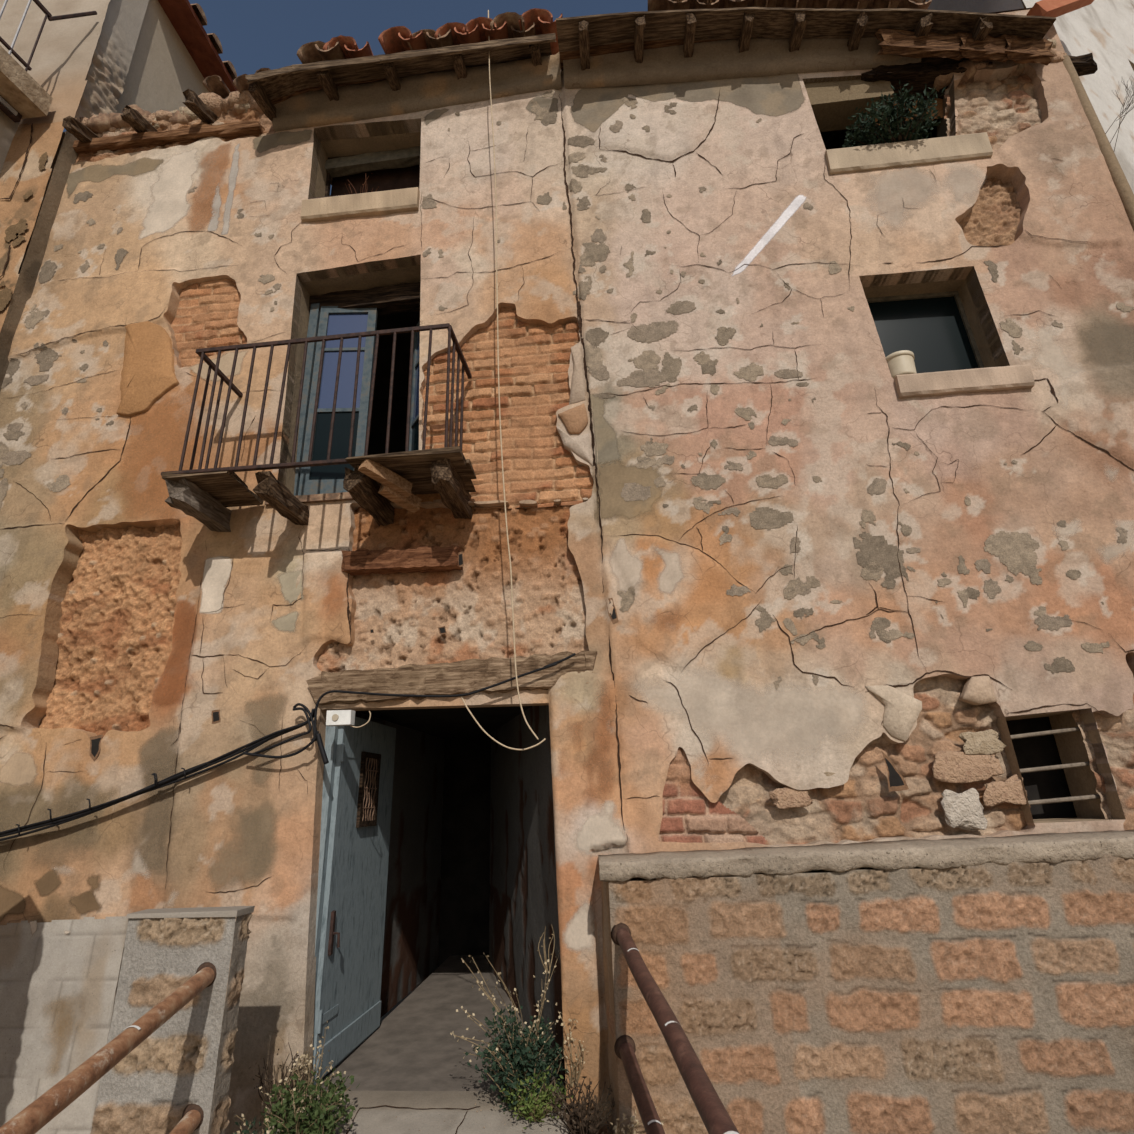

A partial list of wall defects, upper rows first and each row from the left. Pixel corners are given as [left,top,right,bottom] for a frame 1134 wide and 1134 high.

flaking render [171,279,248,381]
crack [3,416,131,529]
flaking render [317,300,798,673]
crack [341,91,1134,764]
flaking render [39,524,182,761]
damp [140,731,176,867]
crack [163,548,308,908]
damp [210,810,274,885]
damp [247,698,284,783]
crack [609,639,660,841]
flaking render [647,673,1031,845]
flaking render [1072,694,1134,830]